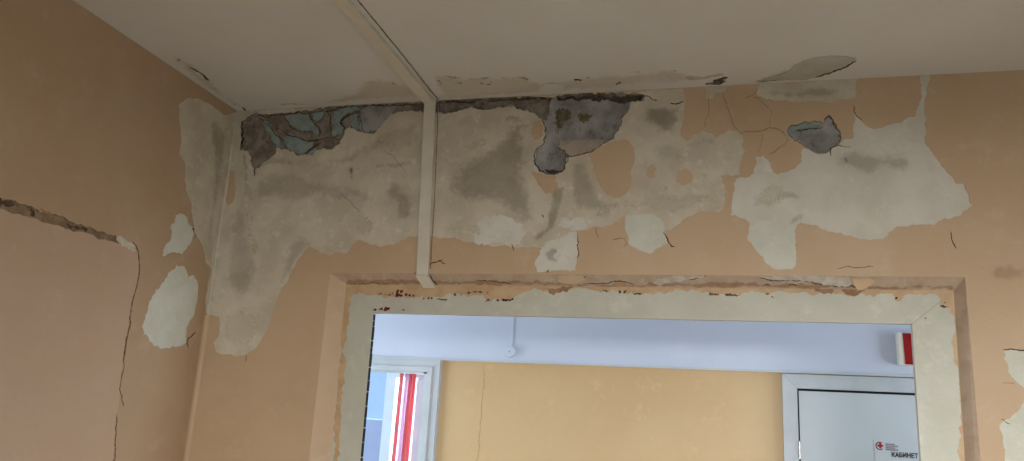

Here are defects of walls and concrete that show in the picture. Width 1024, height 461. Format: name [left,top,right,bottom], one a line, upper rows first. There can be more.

crack [649,80,788,154]
peeling [142,75,972,356]
crack [0,198,140,461]
peeling [1004,349,1024,387]
peeling [1000,403,1024,461]